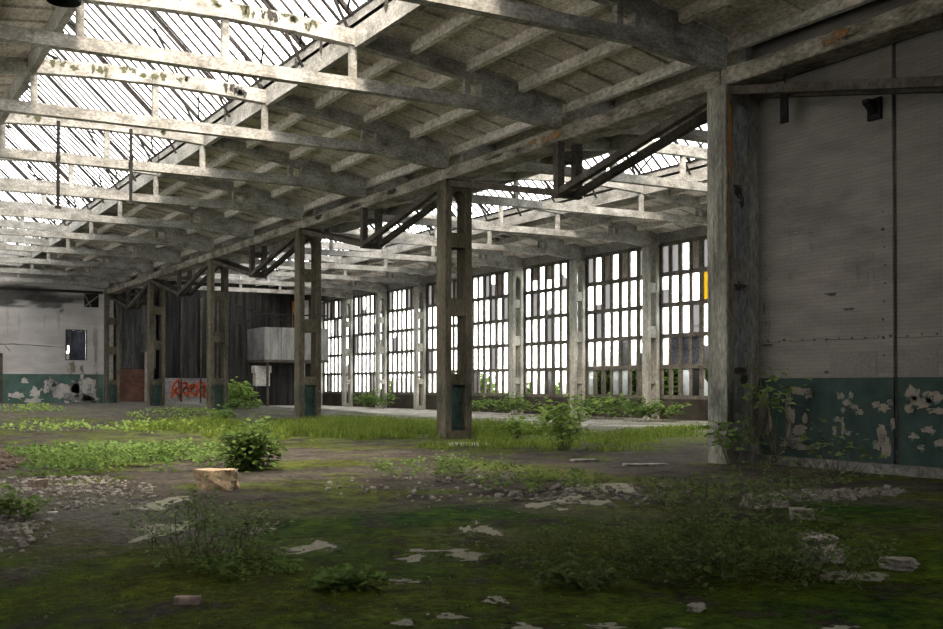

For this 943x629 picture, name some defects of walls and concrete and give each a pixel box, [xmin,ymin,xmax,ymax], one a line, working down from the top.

peeling [7,373,100,403]
peeling [779,386,821,451]
peeling [832,384,943,459]